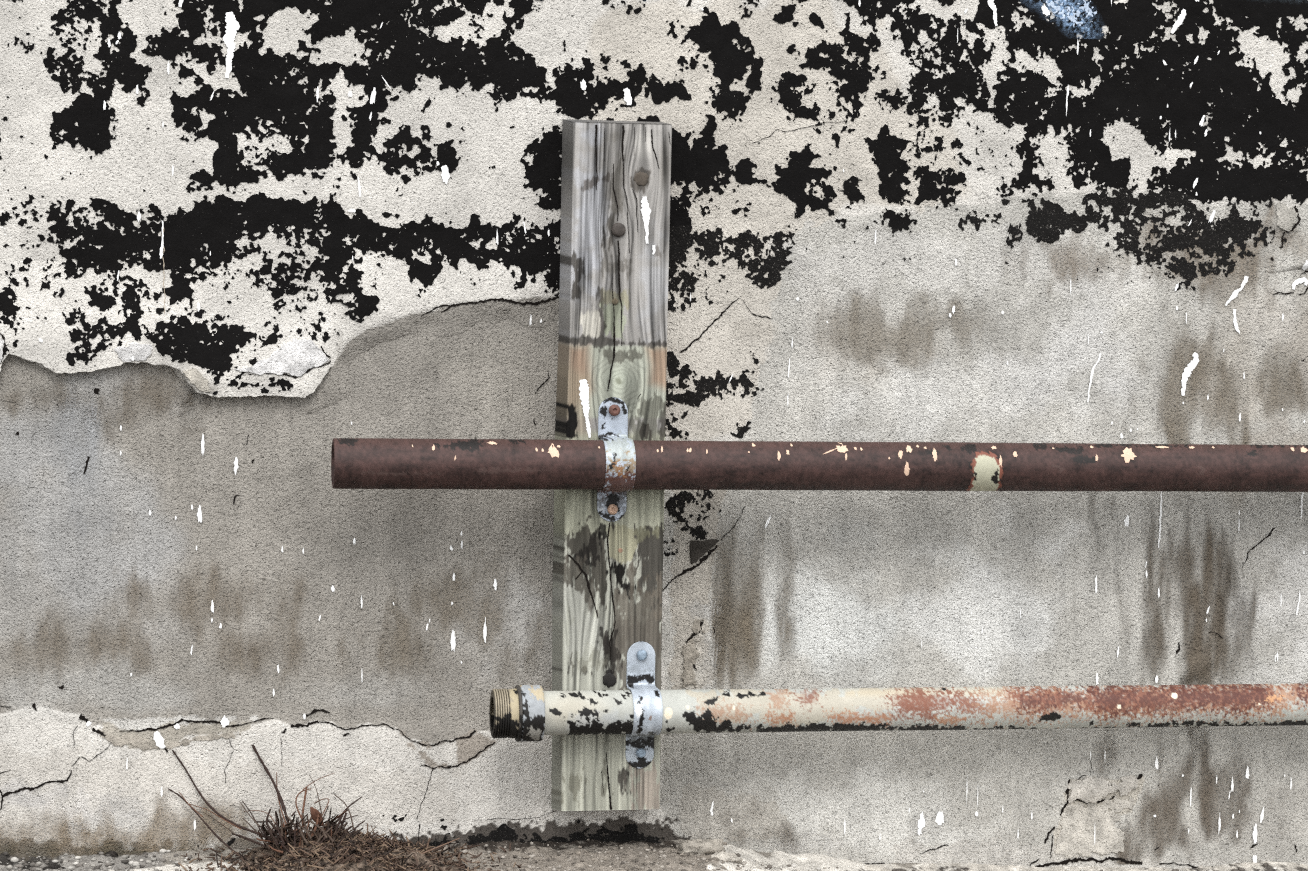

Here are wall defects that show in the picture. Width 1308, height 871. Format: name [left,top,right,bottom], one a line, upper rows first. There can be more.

peeling [0,0,1308,398]
crack [1270,206,1308,295]
crack [680,298,773,353]
peeling [665,351,764,440]
damp [704,551,759,682]
damp [1146,528,1232,685]
crack [0,685,495,841]
crack [1029,759,1214,868]
damp [1118,839,1137,865]
damp [1141,750,1223,856]